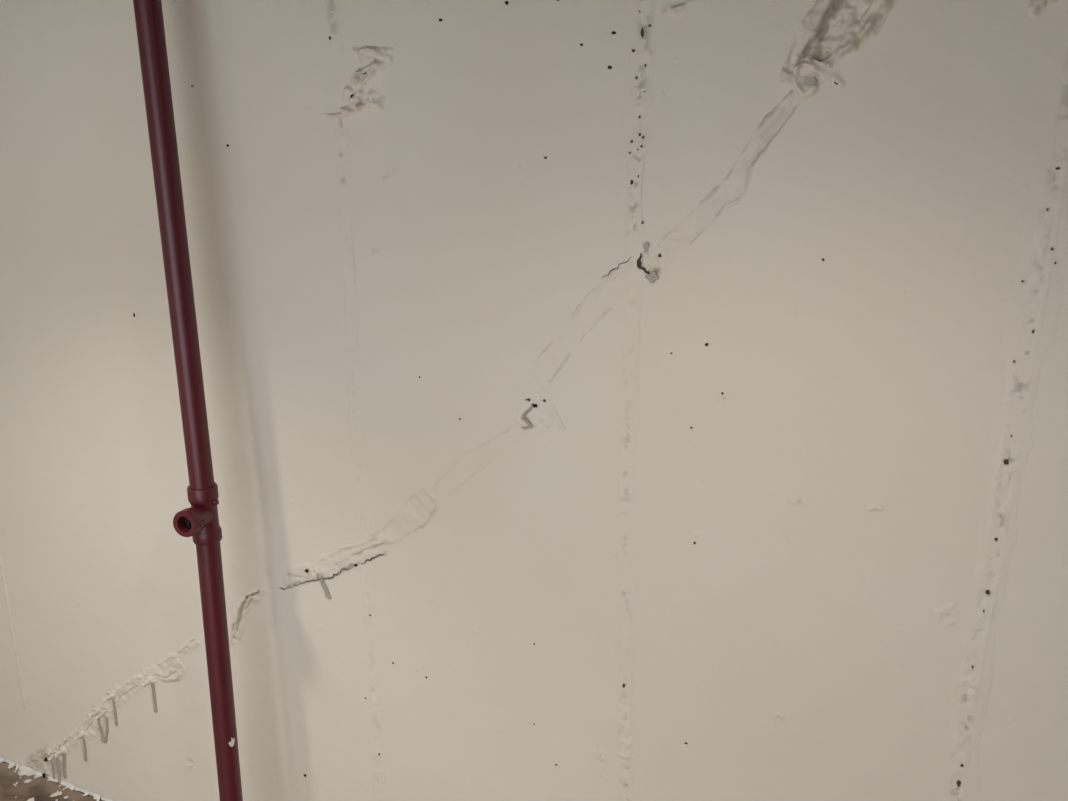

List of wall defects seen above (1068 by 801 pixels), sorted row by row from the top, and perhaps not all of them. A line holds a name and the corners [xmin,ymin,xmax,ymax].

crack [660,0,899,258]
crack [527,257,645,390]
crack [228,420,529,648]
crack [24,636,202,784]